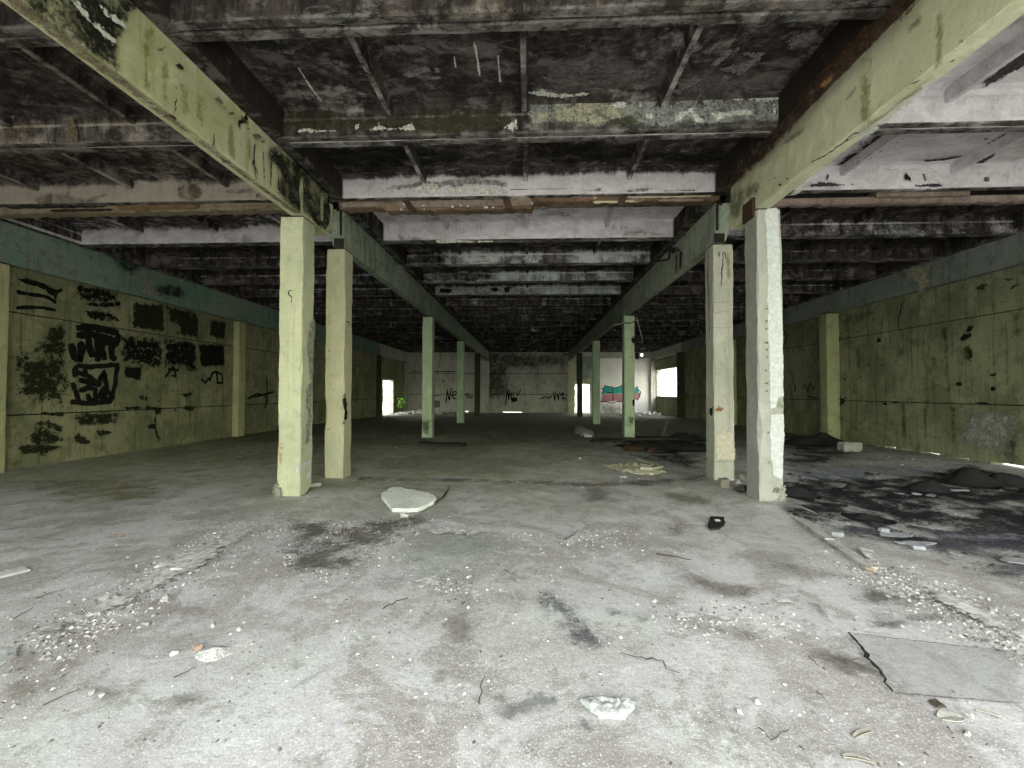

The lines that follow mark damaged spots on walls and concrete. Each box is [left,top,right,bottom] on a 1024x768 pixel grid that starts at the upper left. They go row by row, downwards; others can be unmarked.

peeling [528,89,589,98]
efflorescence [355,123,415,131]
damp [529,99,779,127]
damp [199,141,304,213]
peeling [764,208,785,493]
crack [621,652,680,673]